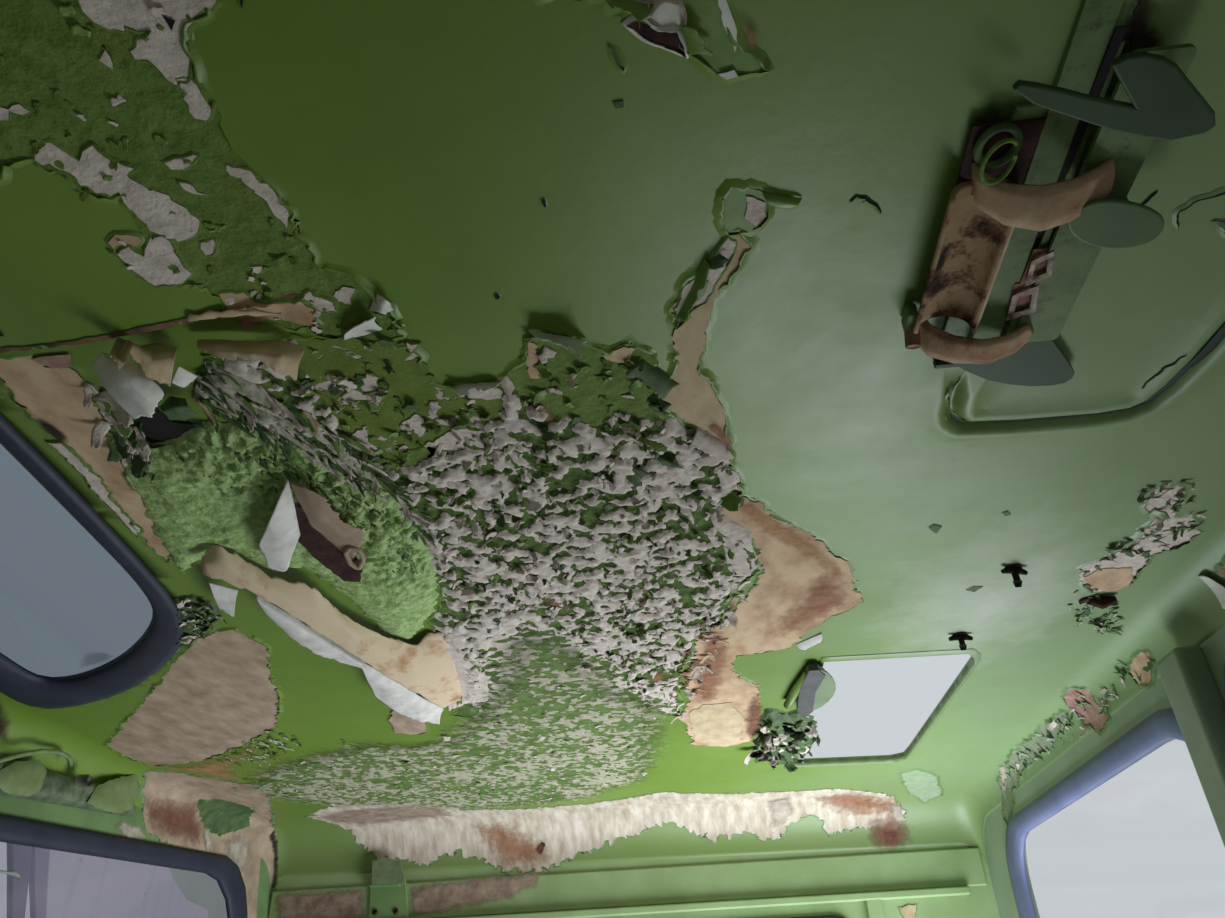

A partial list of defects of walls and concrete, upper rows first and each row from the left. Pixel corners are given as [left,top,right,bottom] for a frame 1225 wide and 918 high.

rust [970,227,1015,334]
rust [1006,247,1054,321]
peeling [0,0,945,918]
peeling [1068,481,1207,636]
peeling [996,649,1157,825]
rust [873,805,907,847]